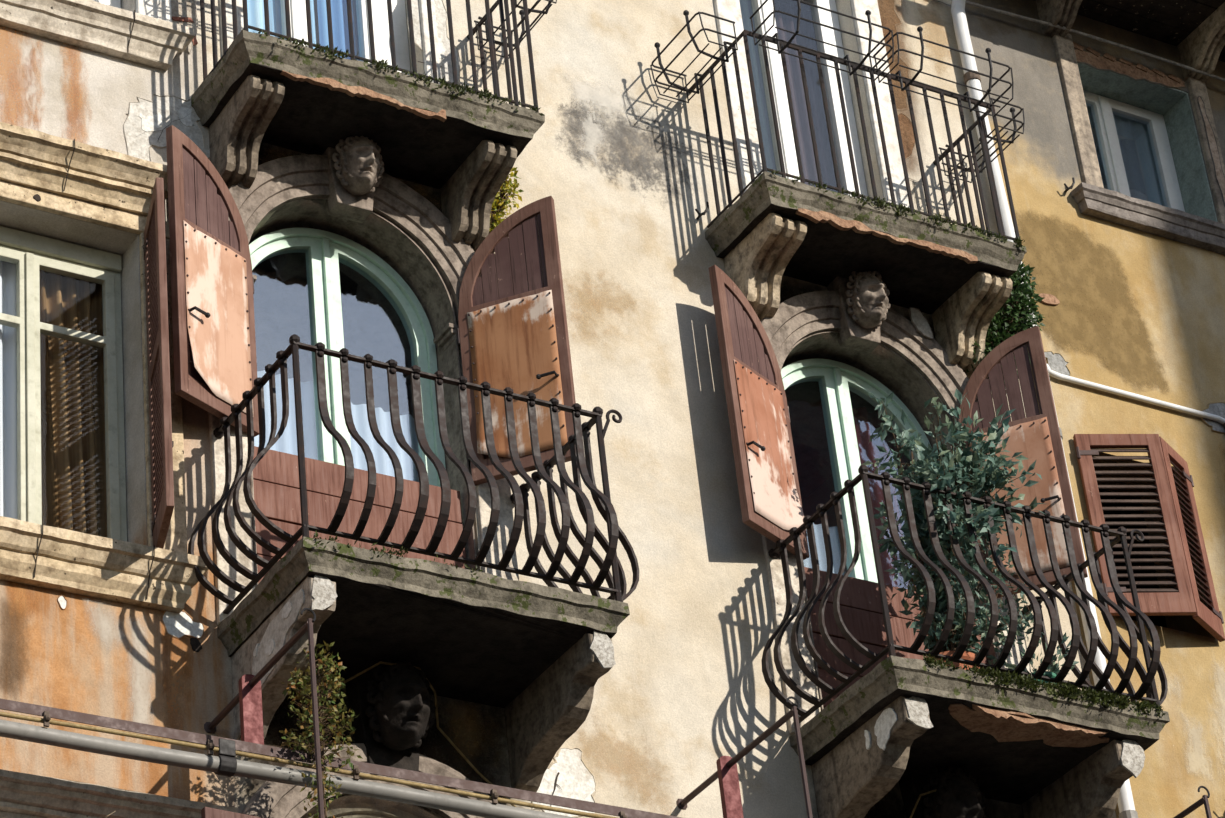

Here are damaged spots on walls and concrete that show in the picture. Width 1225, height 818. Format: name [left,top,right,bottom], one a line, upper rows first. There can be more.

corrosion [0,25,24,125]
corrosion [65,46,85,141]
flaking render [123,94,210,161]
leakage [878,0,917,169]
leakage [1019,214,1168,390]
leakage [0,605,23,689]
peeling [161,611,204,640]
flaking render [531,747,596,818]
peeling [864,696,933,751]
spalling [948,704,1145,778]